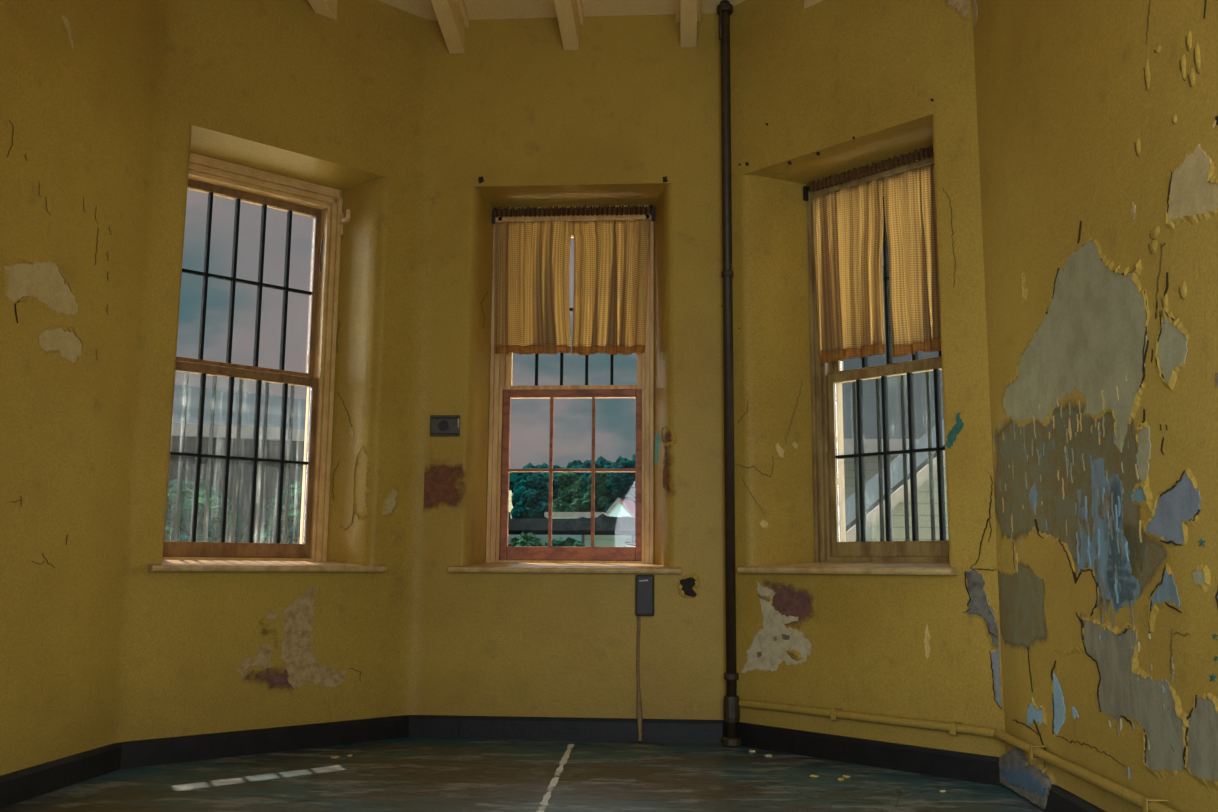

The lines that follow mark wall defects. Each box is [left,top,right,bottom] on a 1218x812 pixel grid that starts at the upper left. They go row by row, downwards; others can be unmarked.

crack [1144,0,1152,45]
peeling [1166,144,1218,230]
peeling [2,259,84,364]
peeling [998,221,1218,791]
peeling [741,582,811,674]
peeling [963,569,1003,711]
peeling [999,747,1057,809]